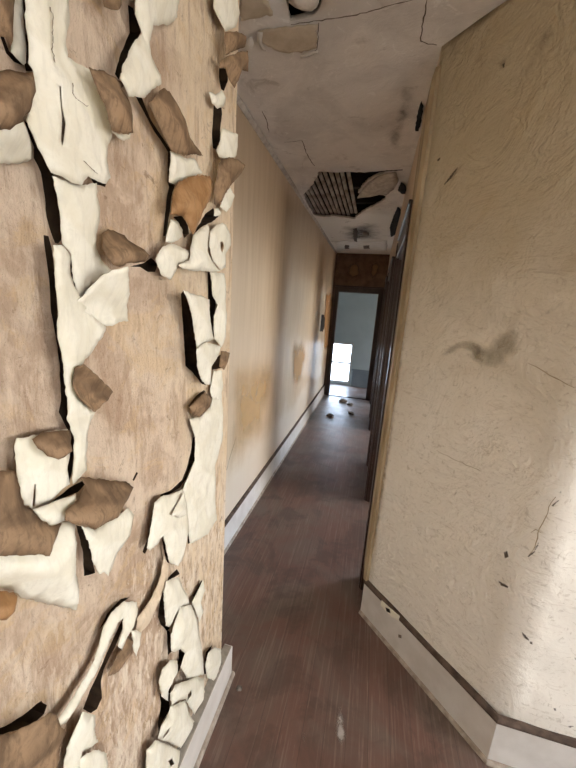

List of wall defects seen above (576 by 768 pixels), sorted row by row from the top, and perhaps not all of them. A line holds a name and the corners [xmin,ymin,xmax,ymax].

flaking render [239,0,273,21]
flaking render [245,24,319,59]
crack [291,0,436,51]
crack [529,497,556,555]